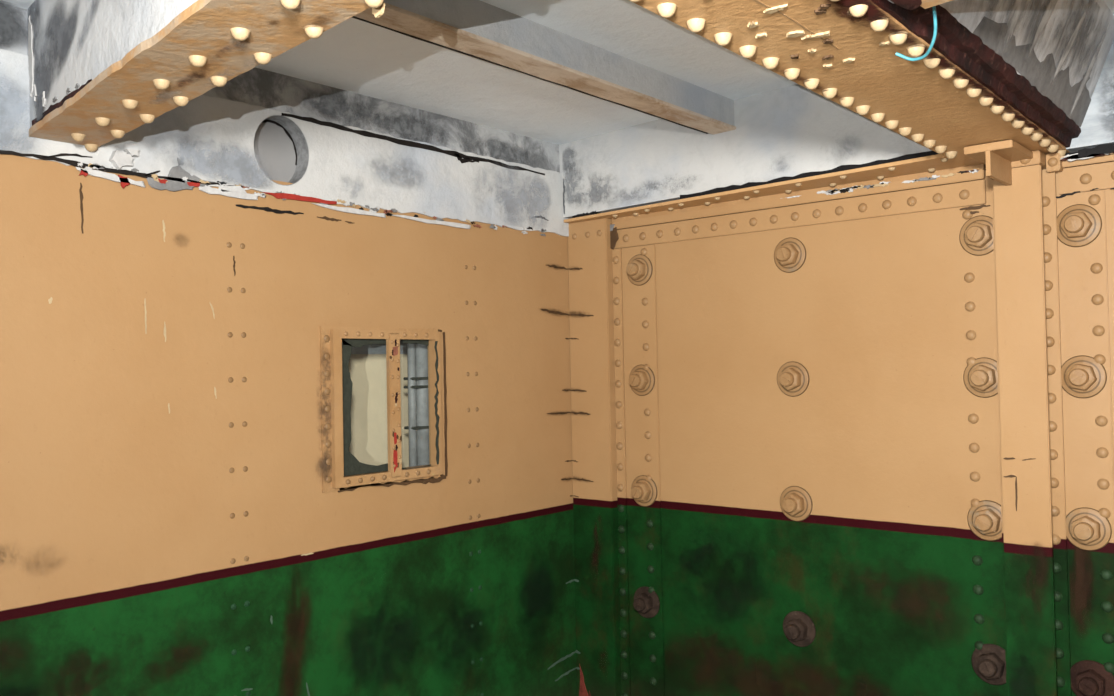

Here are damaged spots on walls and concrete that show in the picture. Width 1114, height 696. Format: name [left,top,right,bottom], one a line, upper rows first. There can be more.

corrosion [828,0,1081,148]
peeling [76,158,507,230]
crack [281,113,565,221]
water stain [563,150,609,203]
crack [546,263,583,271]
crack [541,309,594,339]
crack [547,389,590,415]